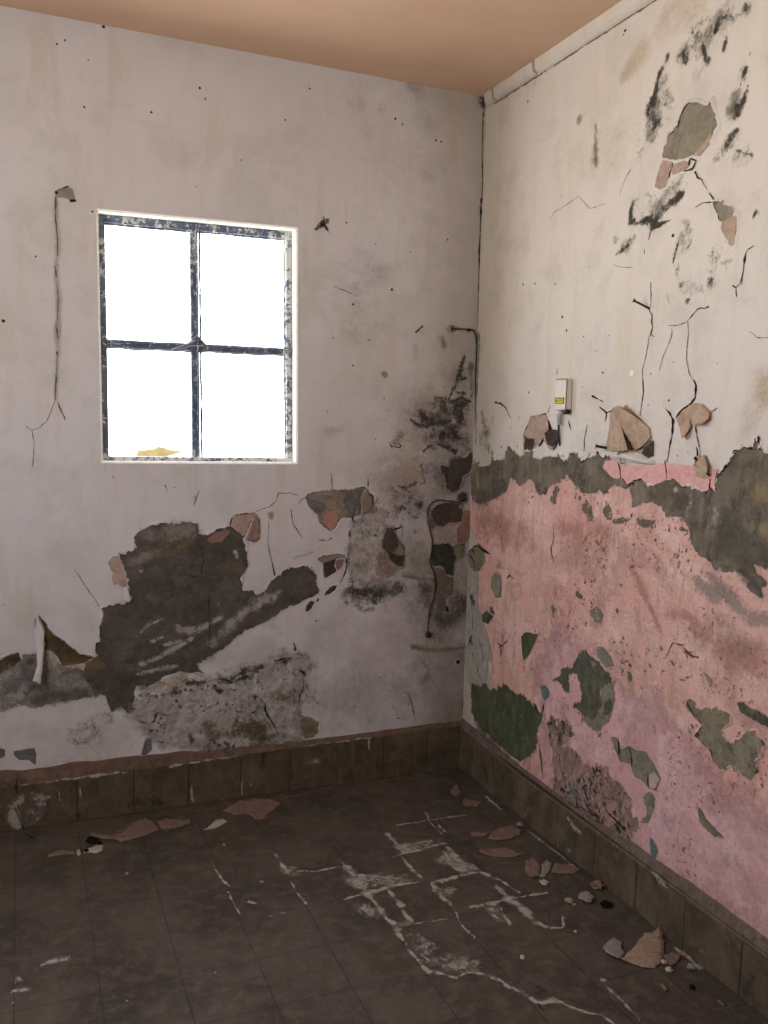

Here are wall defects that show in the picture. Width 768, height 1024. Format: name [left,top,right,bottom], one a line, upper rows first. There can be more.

crack [477,0,657,327]
leakage [615,178,685,256]
leakage [646,4,747,141]
spalling [654,95,741,251]
leakage [724,66,753,156]
crack [26,196,65,467]
leakage [410,333,489,455]
crack [614,223,709,460]
crack [257,493,332,576]
spalling [0,650,23,673]
spalling [33,475,407,756]
peeling [428,399,768,939]